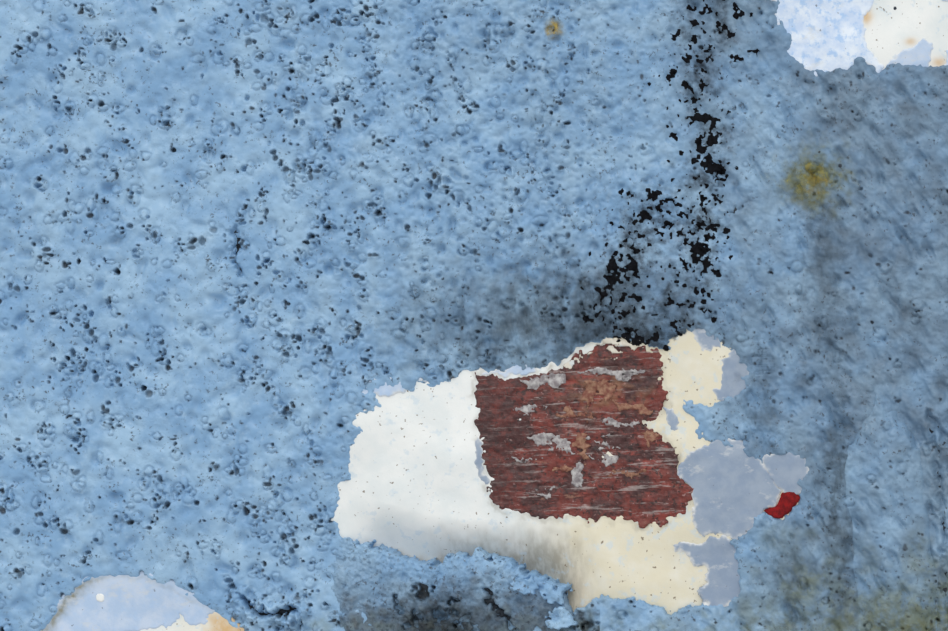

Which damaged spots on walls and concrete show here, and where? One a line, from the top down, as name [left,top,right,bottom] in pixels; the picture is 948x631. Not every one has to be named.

peeling [771,0,948,76]
peeling [331,328,809,615]
peeling [41,571,244,631]